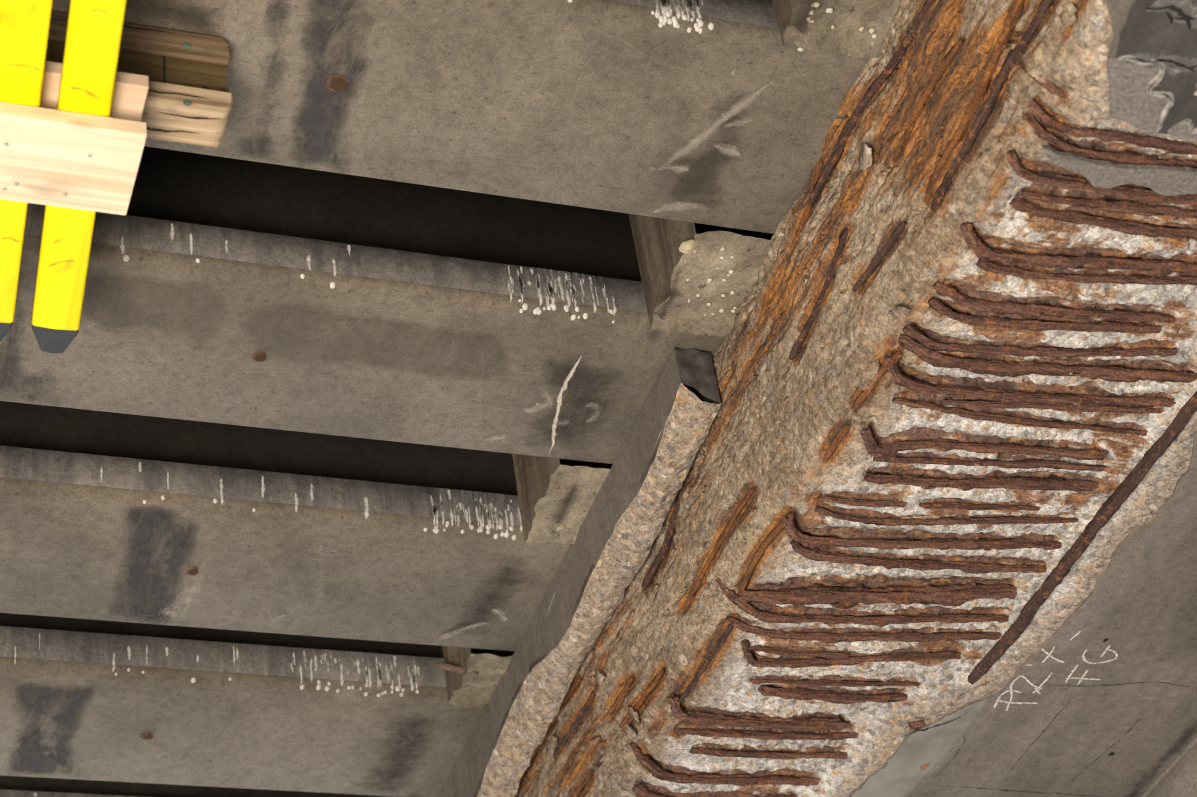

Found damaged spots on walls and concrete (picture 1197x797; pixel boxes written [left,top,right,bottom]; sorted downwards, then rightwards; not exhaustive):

crack [1119,0,1197,72]
corrosion [1028,98,1197,168]
corrosion [1036,212,1197,241]
corrosion [899,340,1167,383]
spalling [515,0,1197,797]
corrosion [894,366,1134,429]
corrosion [873,441,1105,469]
corrosion [891,483,1035,491]
corrosion [907,506,1049,526]
corrosion [798,542,987,574]
corrosion [735,600,971,704]
corrosion [675,714,842,760]